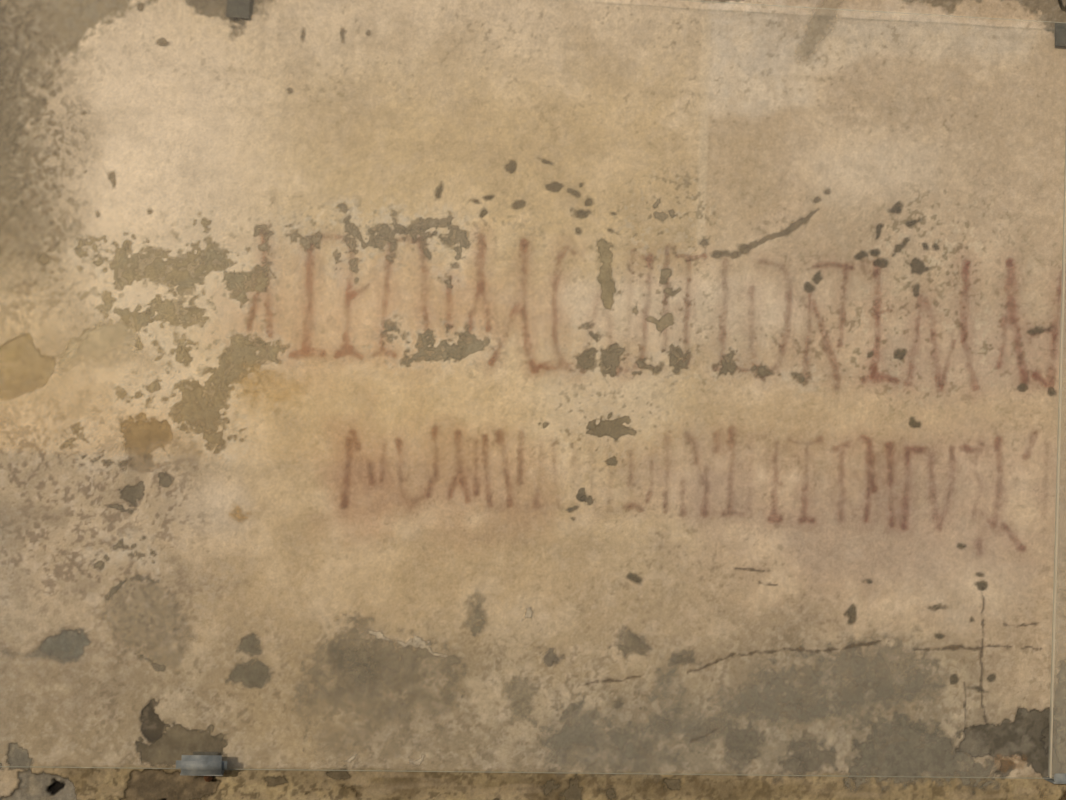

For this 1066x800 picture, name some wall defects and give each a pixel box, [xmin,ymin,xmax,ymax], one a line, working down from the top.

flaking render [333,203,470,288]
flaking render [75,218,273,366]
flaking render [0,334,55,398]
flaking render [117,335,289,454]
flaking render [384,323,490,367]
flaking render [38,630,90,662]
crack [688,641,879,672]
flaking render [845,605,856,624]
crack [915,599,1026,721]
flaking render [0,743,76,800]
flaking render [120,699,227,800]
flaking render [955,660,1066,778]